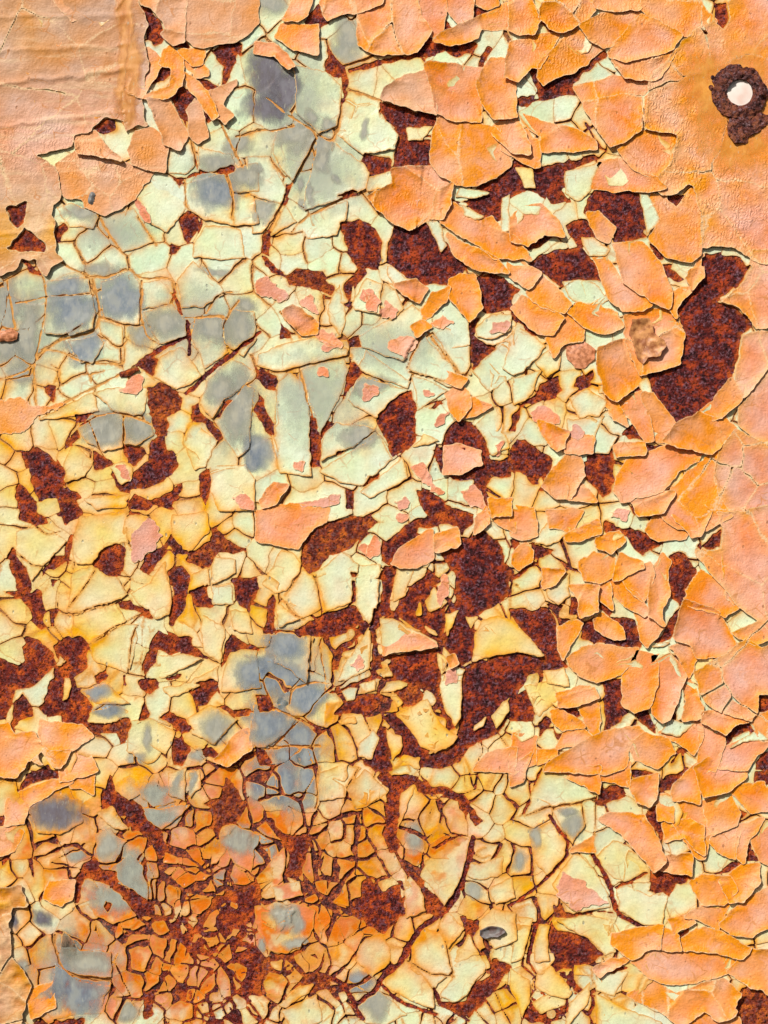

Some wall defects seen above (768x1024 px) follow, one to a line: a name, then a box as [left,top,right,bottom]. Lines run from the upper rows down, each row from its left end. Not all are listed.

crack [444,0,607,92]
peeling [444,0,642,36]
rust [666,47,768,166]
peeling [44,261,257,369]
peeling [55,122,318,252]
crack [0,60,405,451]
rust [64,0,730,444]
crack [493,298,663,430]
rust [0,246,768,1024]
crack [0,552,768,1024]
peeling [411,928,452,988]
peeling [610,887,768,985]